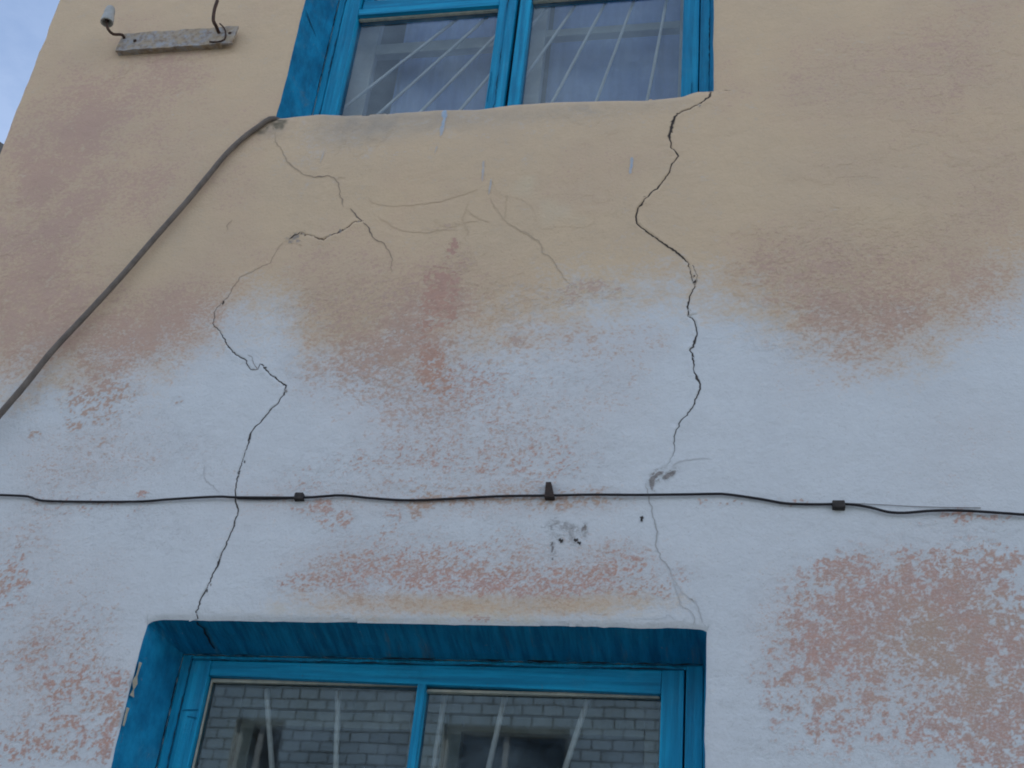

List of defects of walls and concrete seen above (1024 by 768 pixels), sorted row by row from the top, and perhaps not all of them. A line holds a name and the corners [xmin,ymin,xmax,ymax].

crack [155,128,704,768]
peeling [252,446,711,623]
crack [628,0,717,626]
peeling [716,504,1024,768]